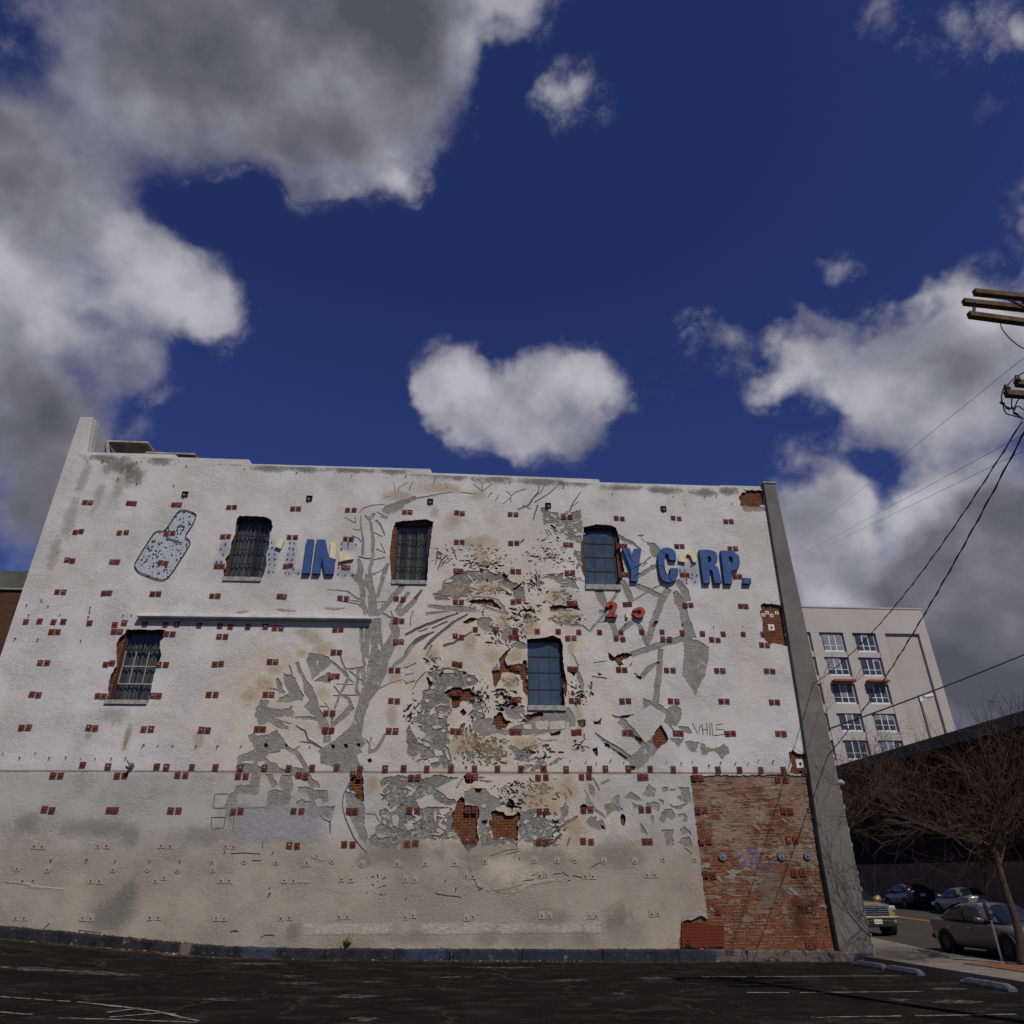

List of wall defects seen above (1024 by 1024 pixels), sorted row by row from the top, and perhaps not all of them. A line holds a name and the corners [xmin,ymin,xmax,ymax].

water stain [92,455,141,482]
flaking render [225,482,836,951]